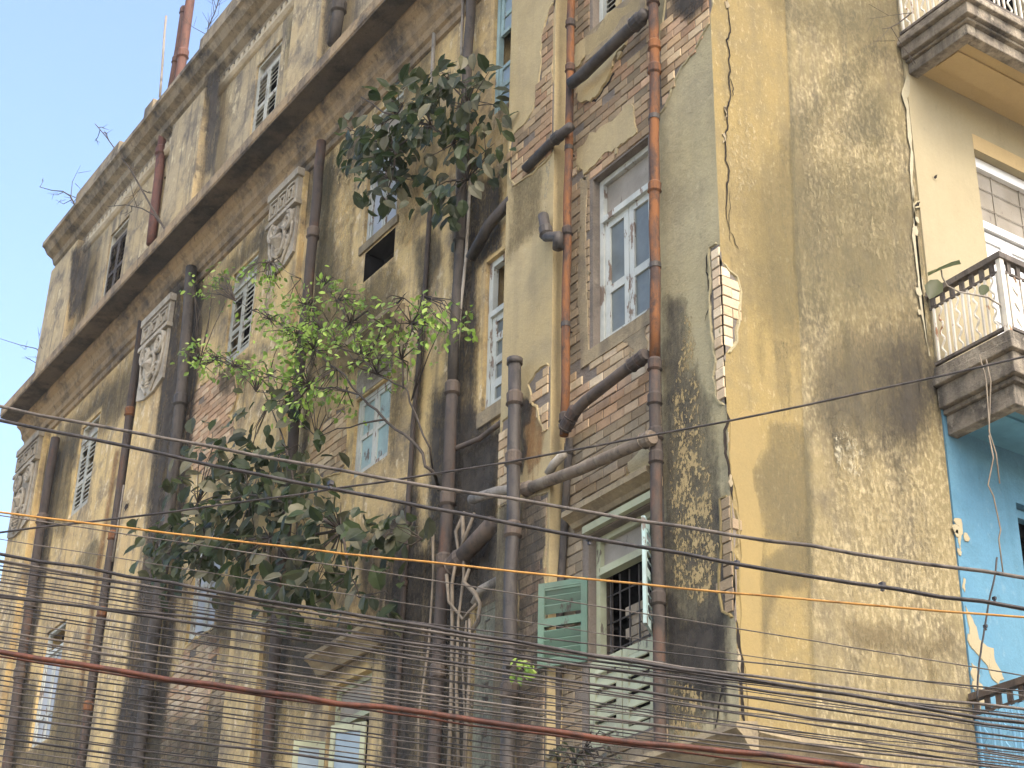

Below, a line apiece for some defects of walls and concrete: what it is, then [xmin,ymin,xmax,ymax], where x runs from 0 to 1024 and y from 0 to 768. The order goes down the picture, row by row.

spalling [506,0,555,187]
flaking render [575,40,628,104]
flaking render [574,0,639,70]
spalling [659,0,714,114]
crack [722,0,739,249]
damp [68,239,92,319]
spalling [707,242,743,408]
spalling [527,363,550,433]
damp [662,300,728,727]
peeling [669,317,742,623]
peeling [952,518,970,556]
peeling [965,606,1004,711]